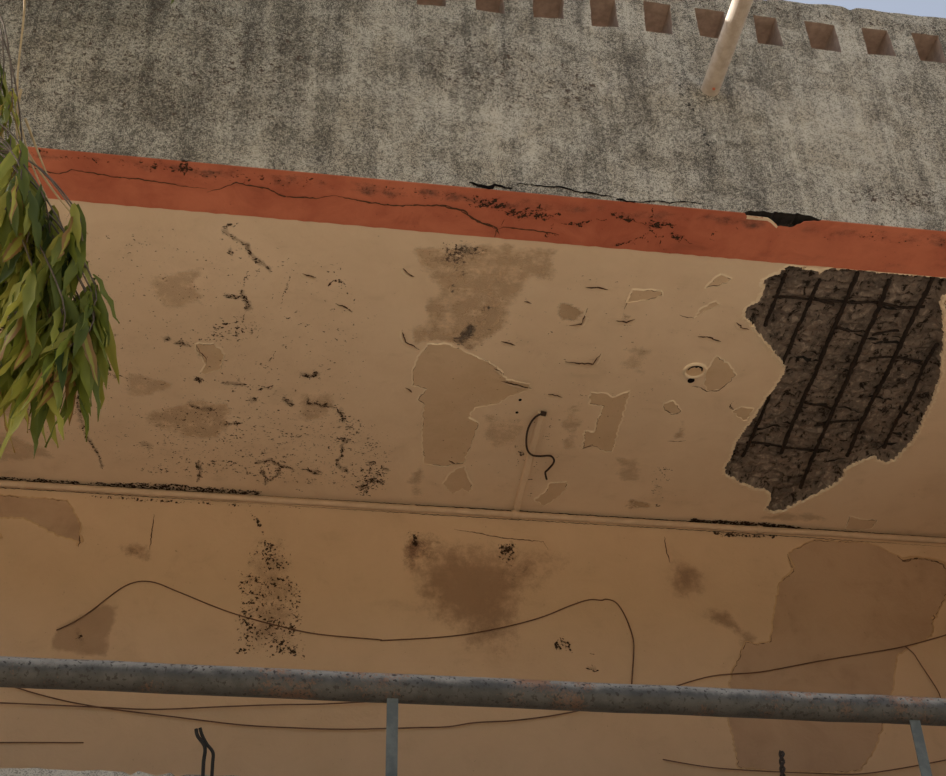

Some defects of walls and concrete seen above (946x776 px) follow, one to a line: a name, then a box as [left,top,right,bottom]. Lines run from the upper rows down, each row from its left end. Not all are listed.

crack [164,223,290,347]
crack [28,166,709,246]
leakage [441,242,486,292]
peeling [399,330,532,467]
crack [1,339,946,547]
leakage [453,306,499,349]
spalling [722,264,946,515]
peeling [0,494,84,546]
leakage [0,382,389,660]
leakage [456,529,548,566]
peeling [728,539,946,695]
peeling [727,717,885,774]